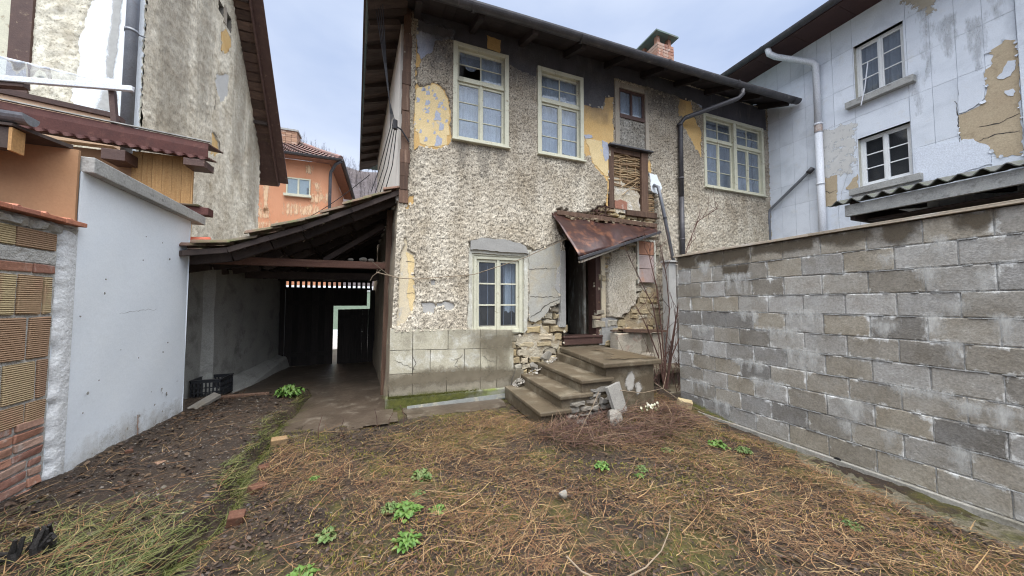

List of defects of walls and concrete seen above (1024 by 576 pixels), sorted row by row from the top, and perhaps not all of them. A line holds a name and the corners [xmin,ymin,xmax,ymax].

flaking render [221,29,231,55]
flaking render [900,0,937,16]
flaking render [410,19,455,150]
flaking render [584,95,660,290]
flaking render [678,98,702,157]
flaking render [823,123,859,207]
flaking render [957,38,1024,158]
flaking render [394,238,416,326]
flaking render [592,265,660,346]
flaking render [625,371,642,394]